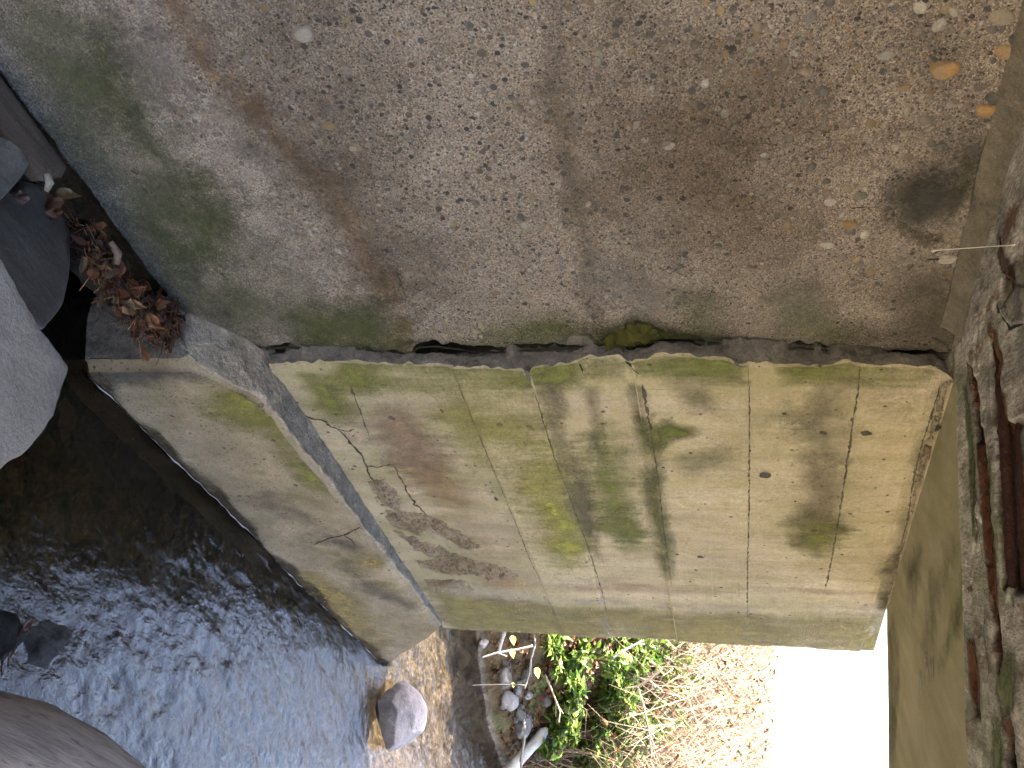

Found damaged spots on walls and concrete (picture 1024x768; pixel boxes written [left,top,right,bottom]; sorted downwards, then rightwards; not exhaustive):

water stain [890,158,963,226]
rust [988,330,1015,441]
water stain [569,443,642,539]
crack [256,333,994,758]
rust [967,364,1002,670]
rust [967,640,981,716]